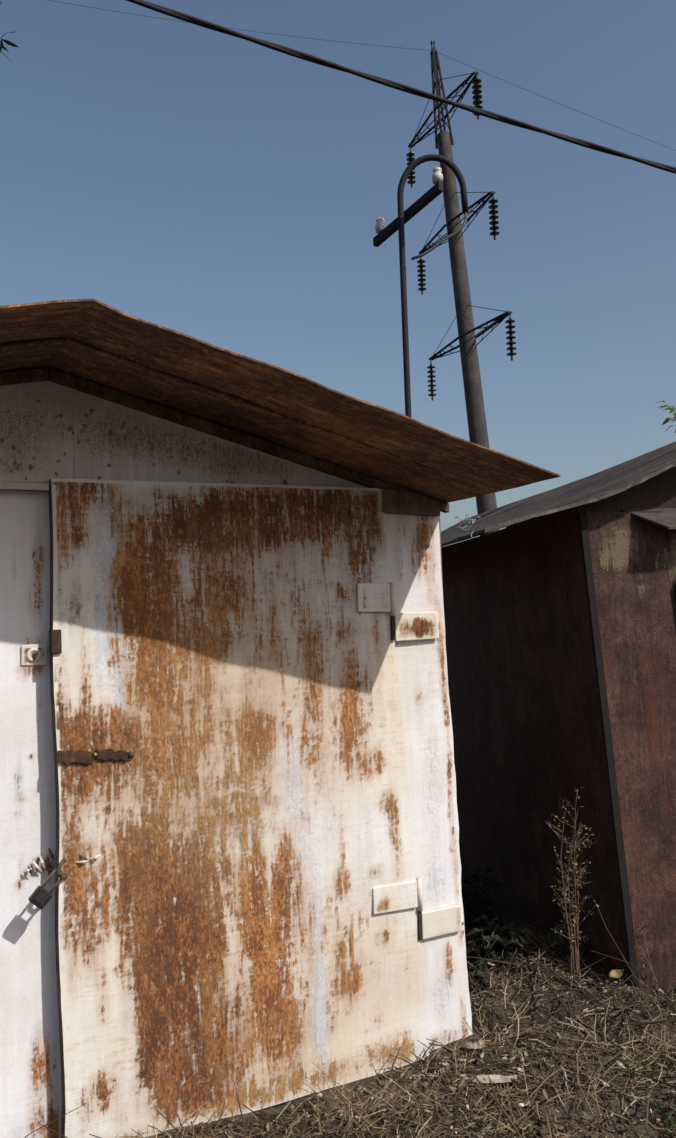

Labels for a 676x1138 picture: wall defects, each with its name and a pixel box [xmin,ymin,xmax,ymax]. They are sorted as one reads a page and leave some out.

corrosion [18,453,435,1138]
peeling [598,527,676,599]